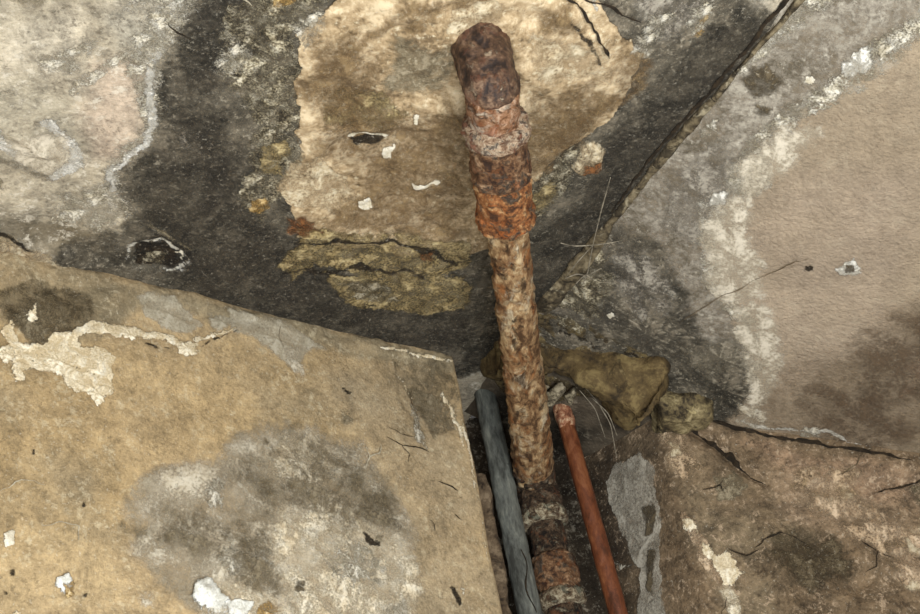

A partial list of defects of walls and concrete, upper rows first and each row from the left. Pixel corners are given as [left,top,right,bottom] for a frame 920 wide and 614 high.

crack [567,0,641,59]
water stain [0,119,85,181]
water stain [38,0,501,378]
flaking render [215,0,651,316]
crack [609,0,789,215]
water stain [529,0,920,422]
peeling [26,303,39,322]
water stain [0,280,94,345]
crack [682,256,814,321]
peeling [0,320,237,406]
crack [693,420,920,494]
water stain [121,423,424,614]